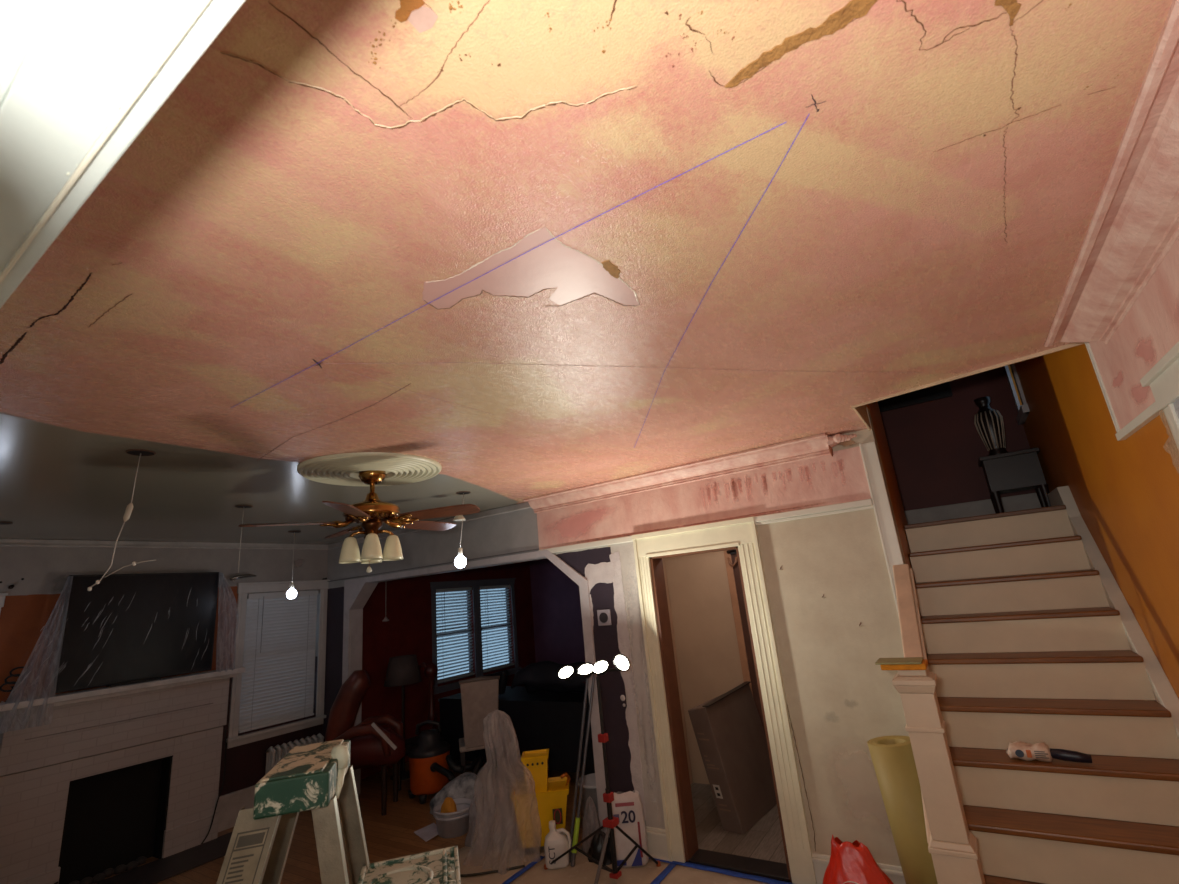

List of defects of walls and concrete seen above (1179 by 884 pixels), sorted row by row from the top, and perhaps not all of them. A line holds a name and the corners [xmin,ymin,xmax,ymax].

peeling [368,0,463,68]
crack [221,0,637,129]
crack [665,14,736,87]
flaking render [920,0,1043,242]
crack [935,105,1060,152]
peeling [422,227,640,309]
crack [0,263,121,364]
crack [89,294,132,327]